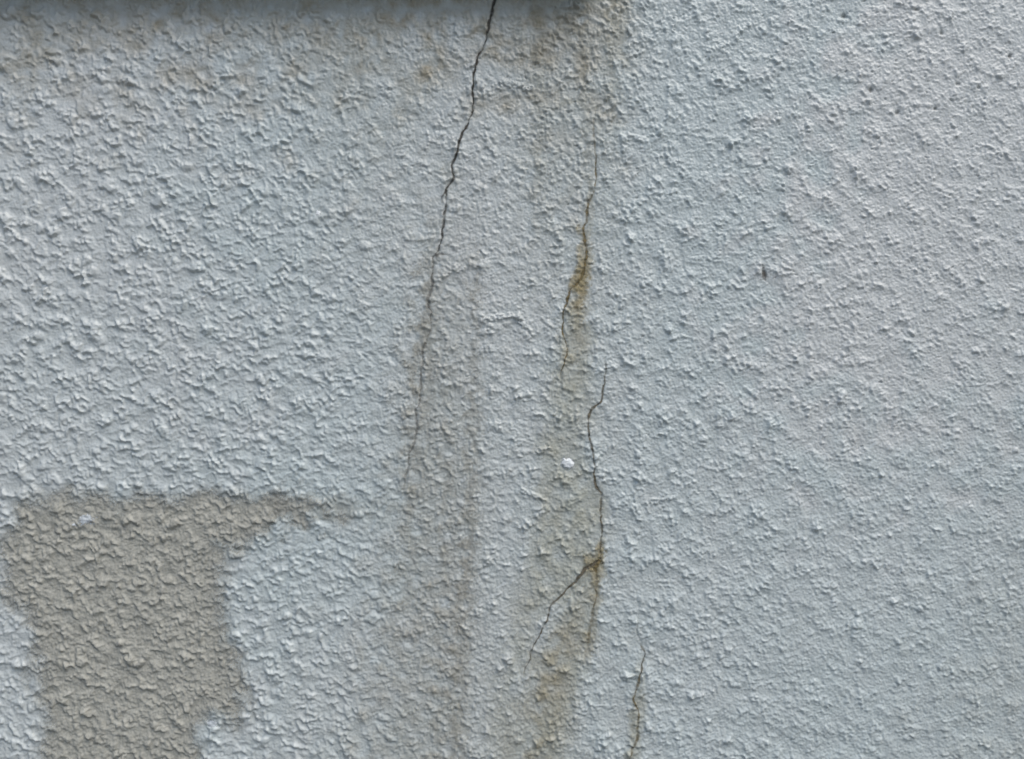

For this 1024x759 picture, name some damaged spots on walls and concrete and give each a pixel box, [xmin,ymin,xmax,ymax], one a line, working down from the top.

crack [428,0,496,314]
crack [561,161,597,371]
crack [529,367,607,661]
crack [631,646,645,756]